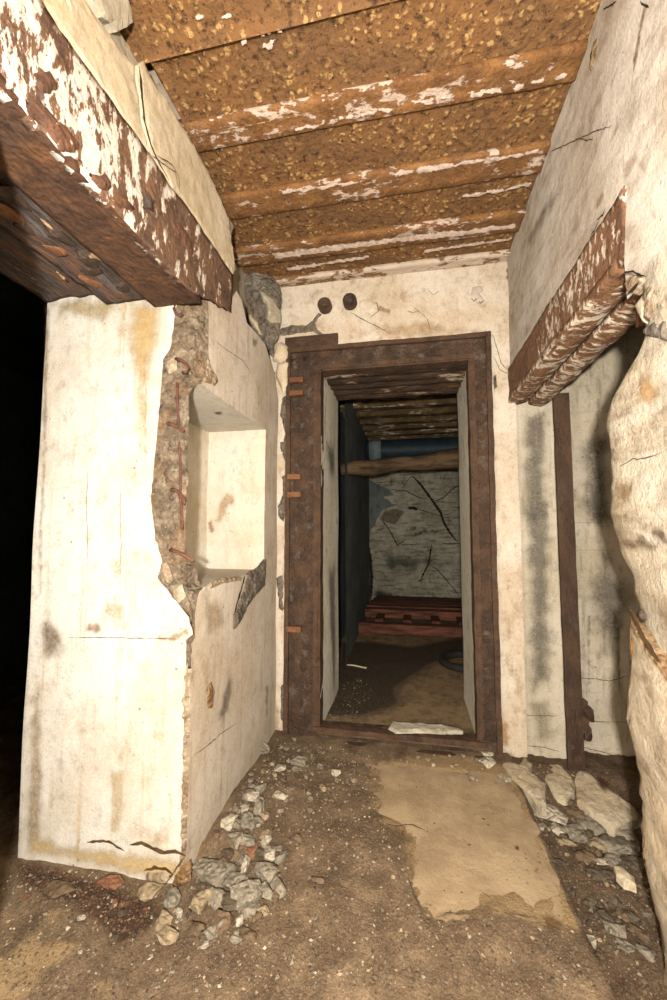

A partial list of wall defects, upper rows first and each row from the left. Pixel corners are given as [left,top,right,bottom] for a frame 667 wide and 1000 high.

peeling [467,73,567,98]
peeling [339,108,393,120]
crack [552,125,612,151]
flaking render [42,0,323,359]
peeling [279,181,362,194]
peeling [387,149,543,177]
peeling [461,183,531,197]
peeling [272,224,516,271]
crack [369,476,460,601]
leakage [527,416,548,683]
spalling [146,300,284,886]
crack [87,840,185,884]